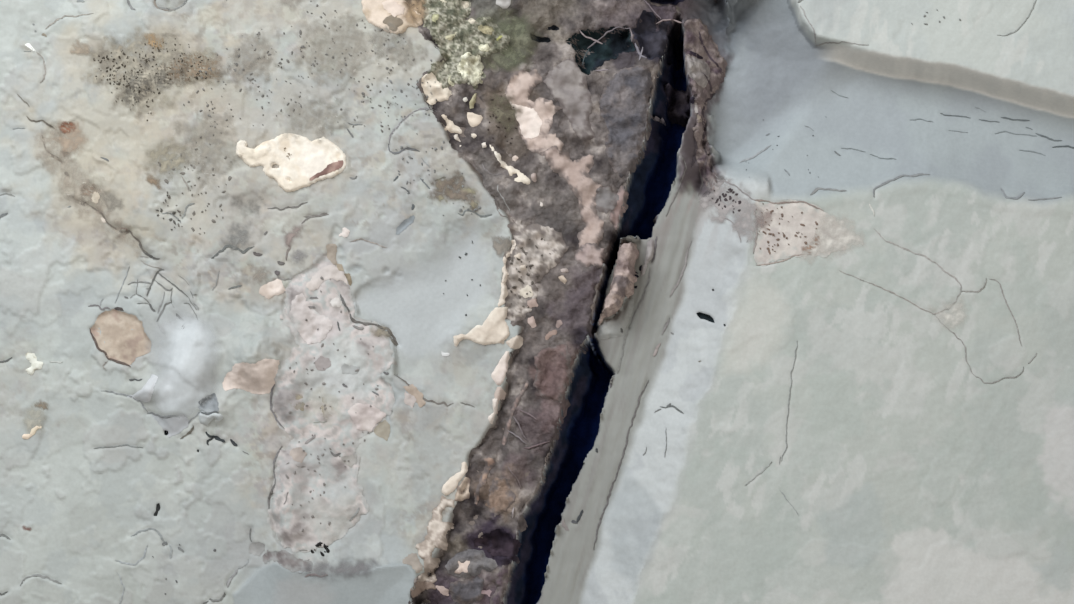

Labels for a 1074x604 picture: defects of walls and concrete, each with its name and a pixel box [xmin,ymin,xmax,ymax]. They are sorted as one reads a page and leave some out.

leakage [39,130,127,238]
crack [14,94,199,333]
flaking render [88,299,152,370]
crack [205,431,248,454]
leakage [71,0,418,234]
flaking render [152,202,398,604]
peeling [236,133,357,192]
spalling [361,0,727,604]
crack [561,119,846,544]
peeling [753,199,863,266]
crack [834,148,1037,383]
crack [911,107,1074,155]